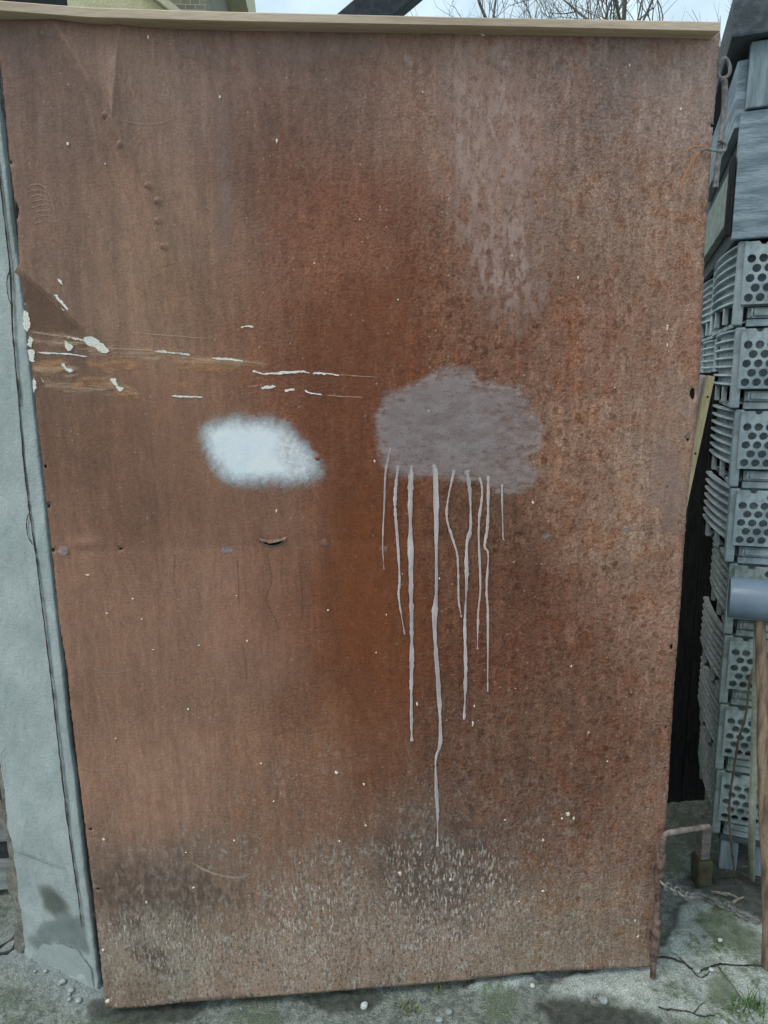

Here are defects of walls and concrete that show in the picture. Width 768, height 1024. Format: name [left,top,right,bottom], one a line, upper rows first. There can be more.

peeling [23,311,35,362]
peeling [84,336,109,353]
water stain [109,913,225,972]
efflorescence [256,881,359,978]
efflorescence [379,842,514,961]